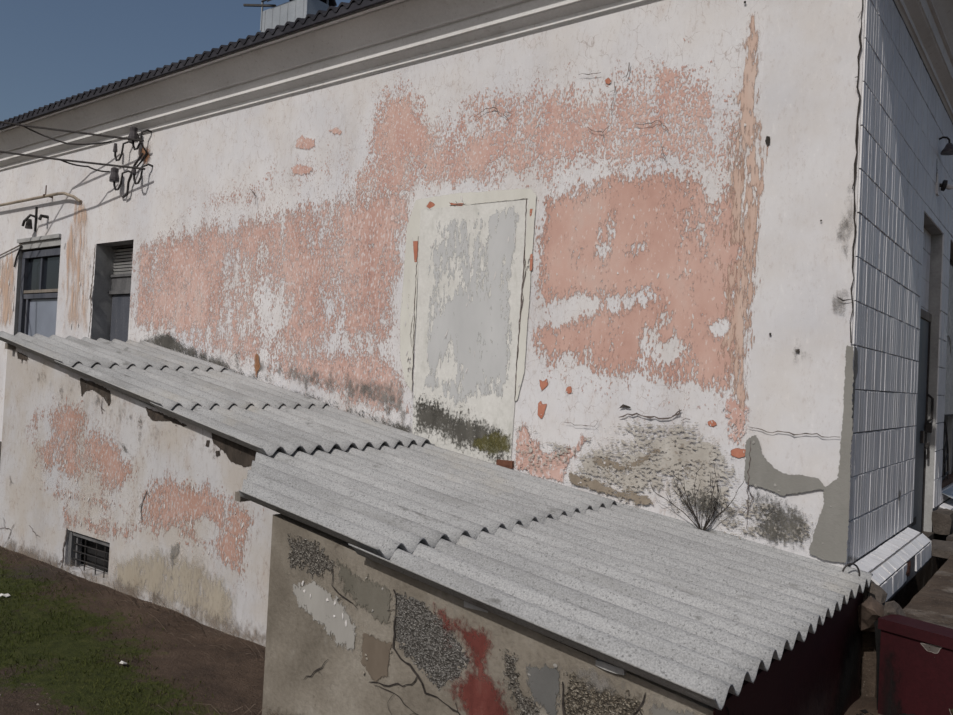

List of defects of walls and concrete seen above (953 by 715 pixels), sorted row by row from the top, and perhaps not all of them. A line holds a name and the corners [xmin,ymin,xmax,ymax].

crack [837,0,863,343]
peeling [129,16,813,550]
leakage [144,331,512,464]
crack [620,409,690,421]
peeling [27,378,264,586]
leakage [670,489,737,525]
leakage [745,493,809,549]
crack [332,569,357,608]
flaking render [287,534,470,690]
crack [372,589,460,715]
flaking render [499,649,540,715]
flaking render [553,664,643,715]